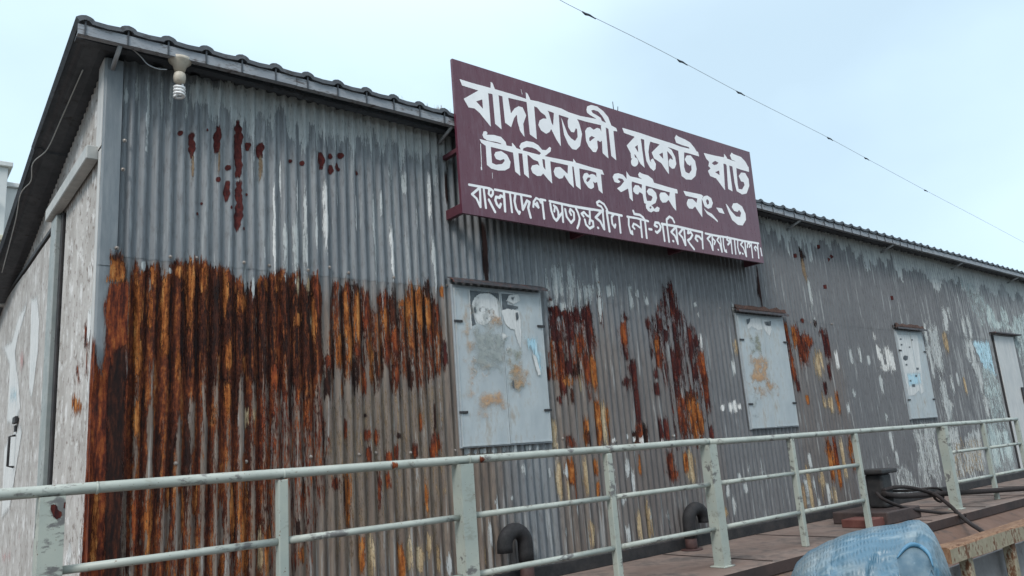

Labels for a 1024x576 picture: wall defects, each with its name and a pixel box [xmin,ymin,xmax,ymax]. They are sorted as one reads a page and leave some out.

corrosion [177,131,196,177]
corrosion [207,120,265,232]
corrosion [318,152,344,175]
corrosion [71,249,452,576]
corrosion [546,284,611,499]
corrosion [618,281,714,484]
corrosion [734,246,850,415]
corrosion [800,435,856,509]
peeling [758,216,1024,480]
peeling [884,414,944,493]